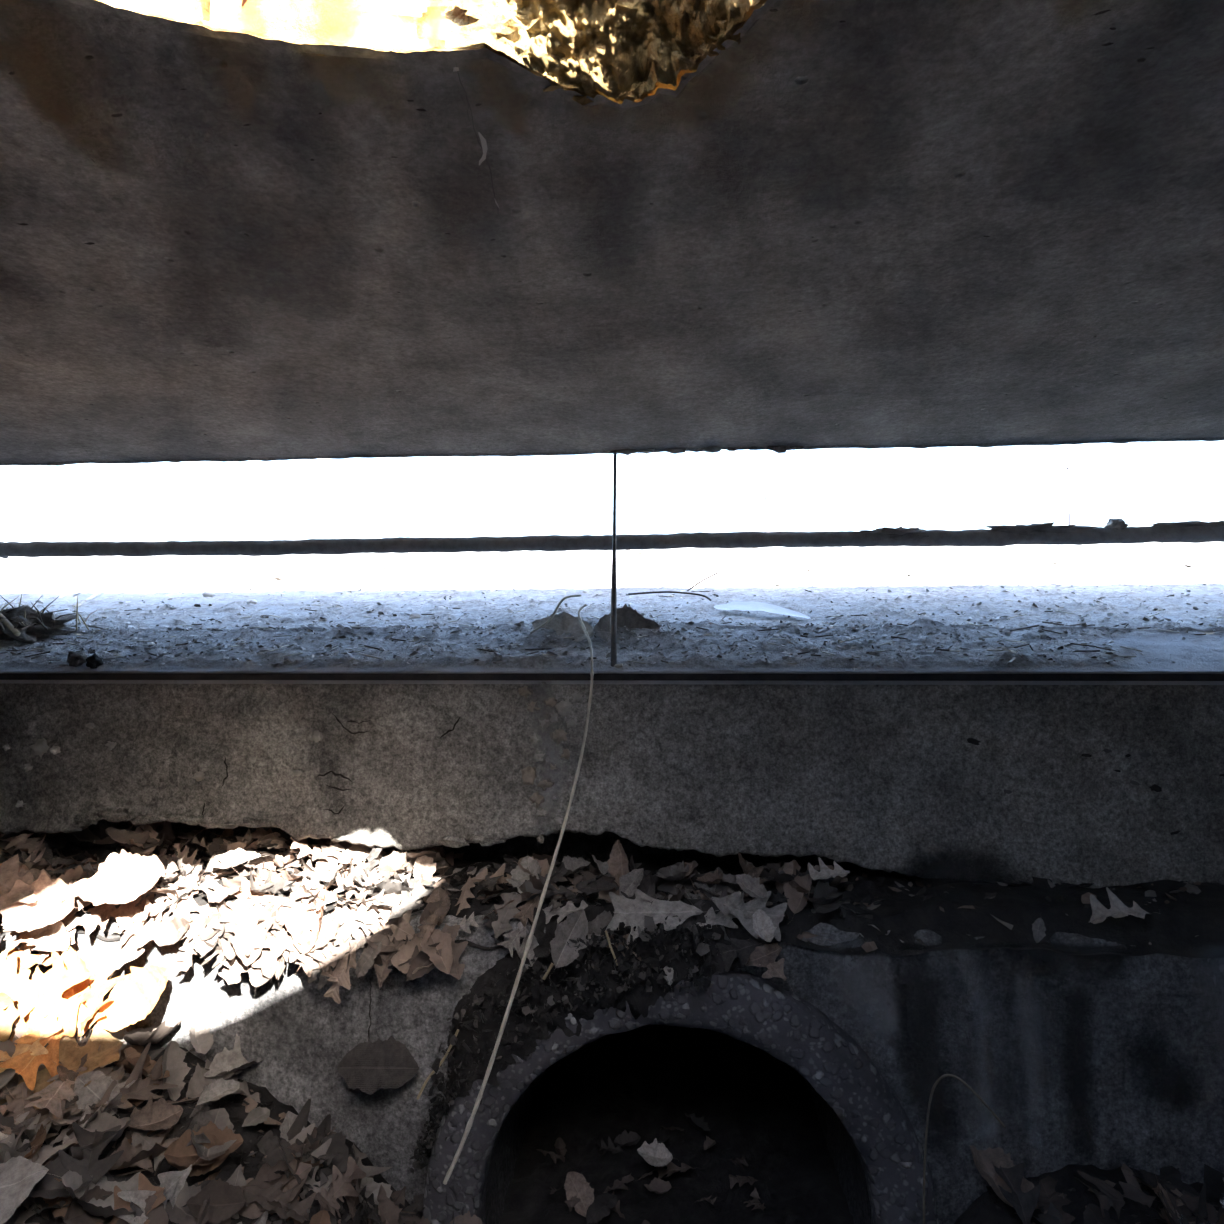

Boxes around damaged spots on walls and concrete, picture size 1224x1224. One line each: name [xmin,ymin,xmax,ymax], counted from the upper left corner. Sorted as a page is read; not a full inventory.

rust [239,0,264,33]
rust [319,0,360,42]
spalling [447,0,779,105]
damp [840,939,956,1152]
damp [1063,989,1096,1159]
damp [1133,1039,1199,1110]